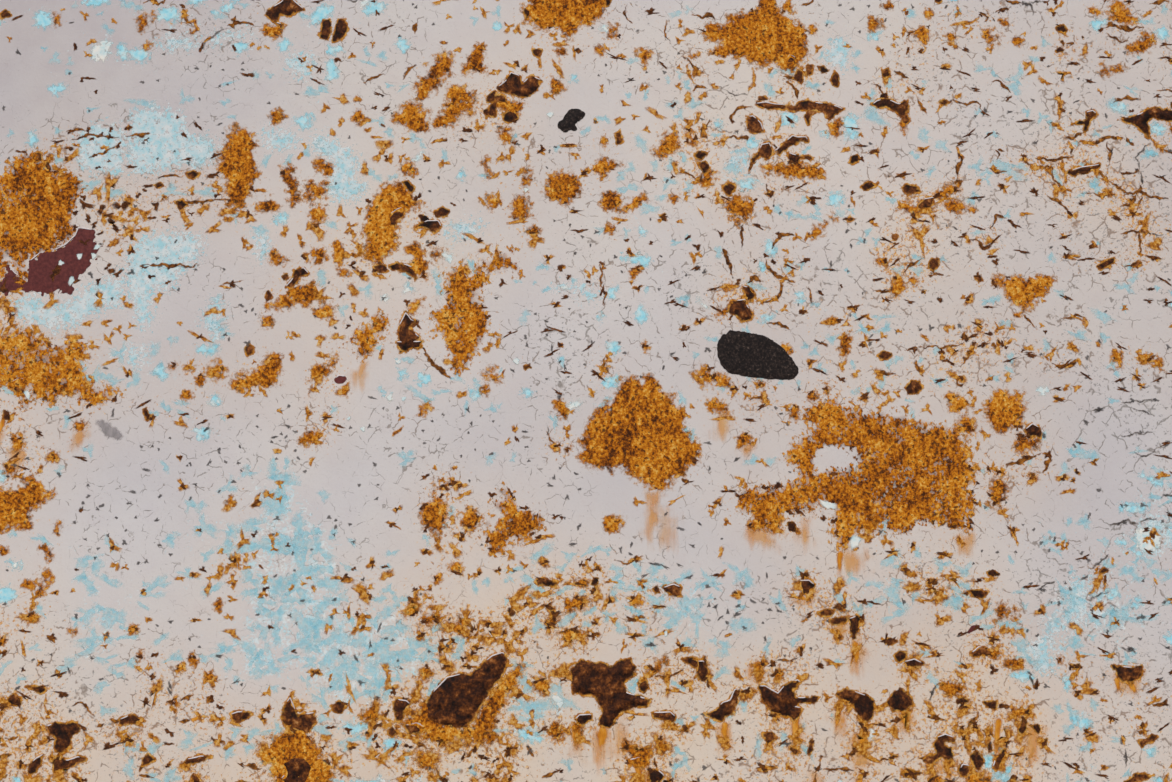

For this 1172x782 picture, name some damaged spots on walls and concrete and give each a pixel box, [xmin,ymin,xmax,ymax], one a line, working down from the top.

peeling [71,102,223,189]
crack [664,12,804,193]
crack [871,46,1011,113]
crack [990,104,1172,253]
spalling [717,285,798,380]
crack [722,225,812,329]
rust [820,305,902,377]
rust [975,274,1081,368]
rust [175,529,279,639]
peeling [534,576,559,589]
rust [549,345,1053,782]
peeling [1110,664,1144,692]